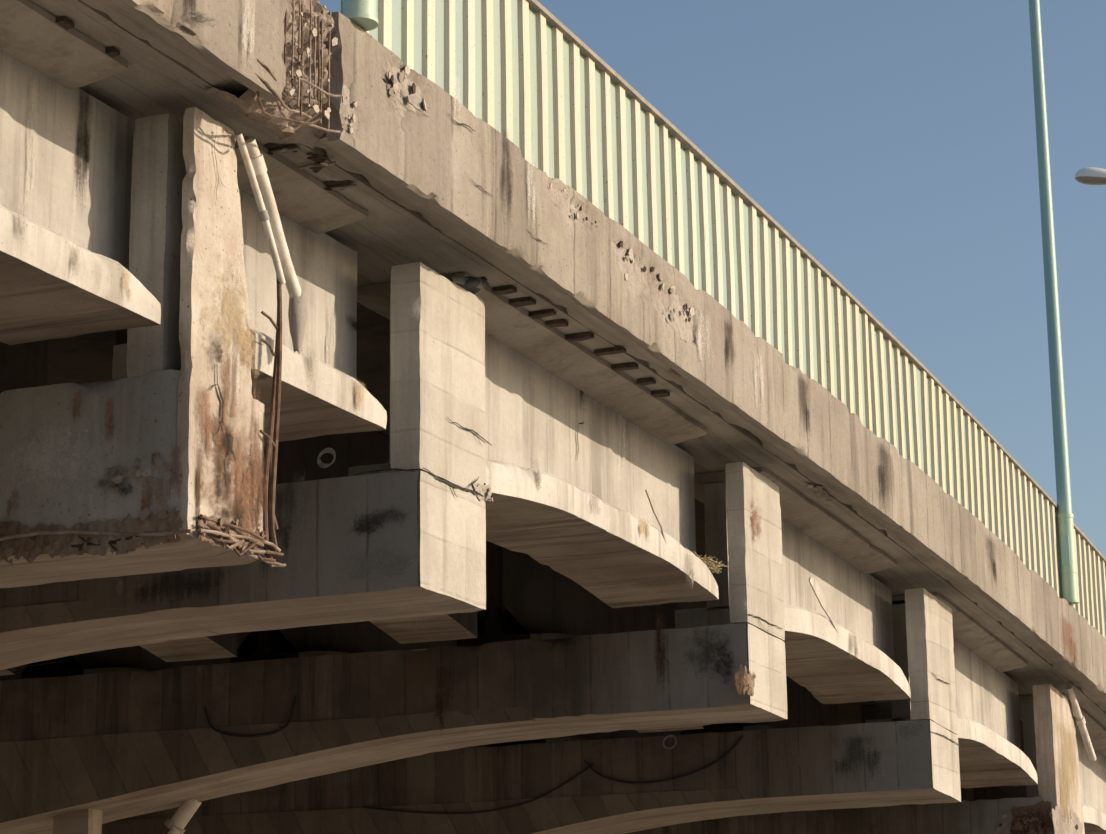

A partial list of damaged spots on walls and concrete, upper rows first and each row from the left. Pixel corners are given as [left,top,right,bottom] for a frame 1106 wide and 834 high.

water stain [77,95,89,176]
spalling [205,0,358,191]
spalling [381,58,427,124]
spalling [547,183,596,231]
spalling [611,241,698,344]
spalling [0,275,286,567]
corrosion [196,278,264,536]
crack [354,468,491,500]
water stain [879,448,891,495]
spalling [994,800,1083,834]